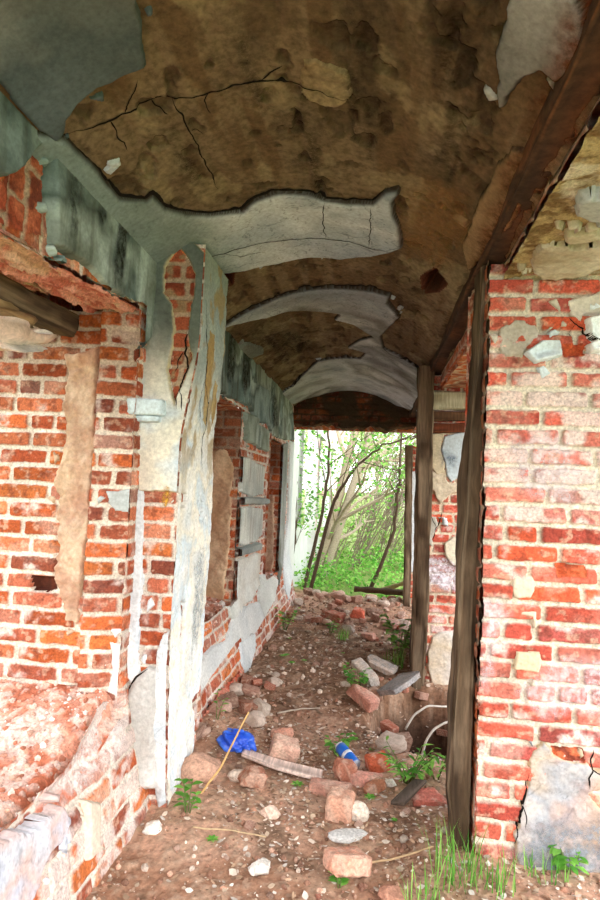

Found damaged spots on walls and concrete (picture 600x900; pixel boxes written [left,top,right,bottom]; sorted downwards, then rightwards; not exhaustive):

flaking render [483,0,587,107]
crack [64,66,402,257]
leakage [115,224,127,283]
flaking render [517,185,600,281]
flaking render [0,0,419,807]
crack [175,284,390,469]
flaking render [433,432,465,482]
flaking render [523,299,600,378]
flaking render [0,790,105,900]
crack [515,776,529,843]
flaking render [509,741,600,873]
crack [588,750,600,786]